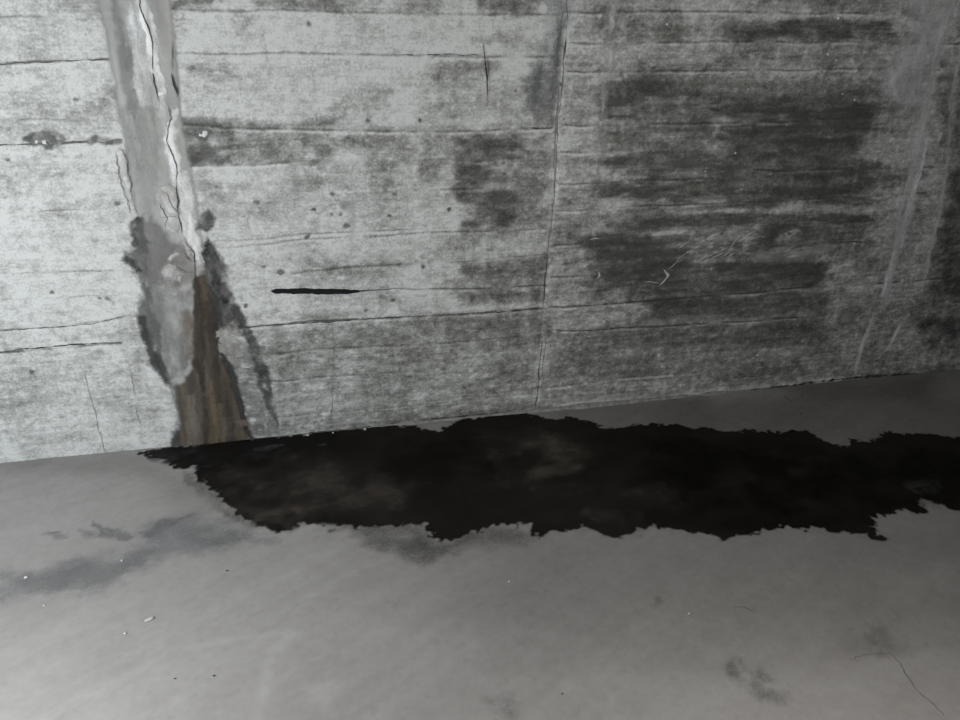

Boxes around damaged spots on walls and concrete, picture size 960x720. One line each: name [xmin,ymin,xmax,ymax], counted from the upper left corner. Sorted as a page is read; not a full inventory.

crack [139,0,196,283]
flaking render [156,184,192,296]
rust [175,276,254,446]
crack [483,2,568,313]
leakage [120,0,960,568]